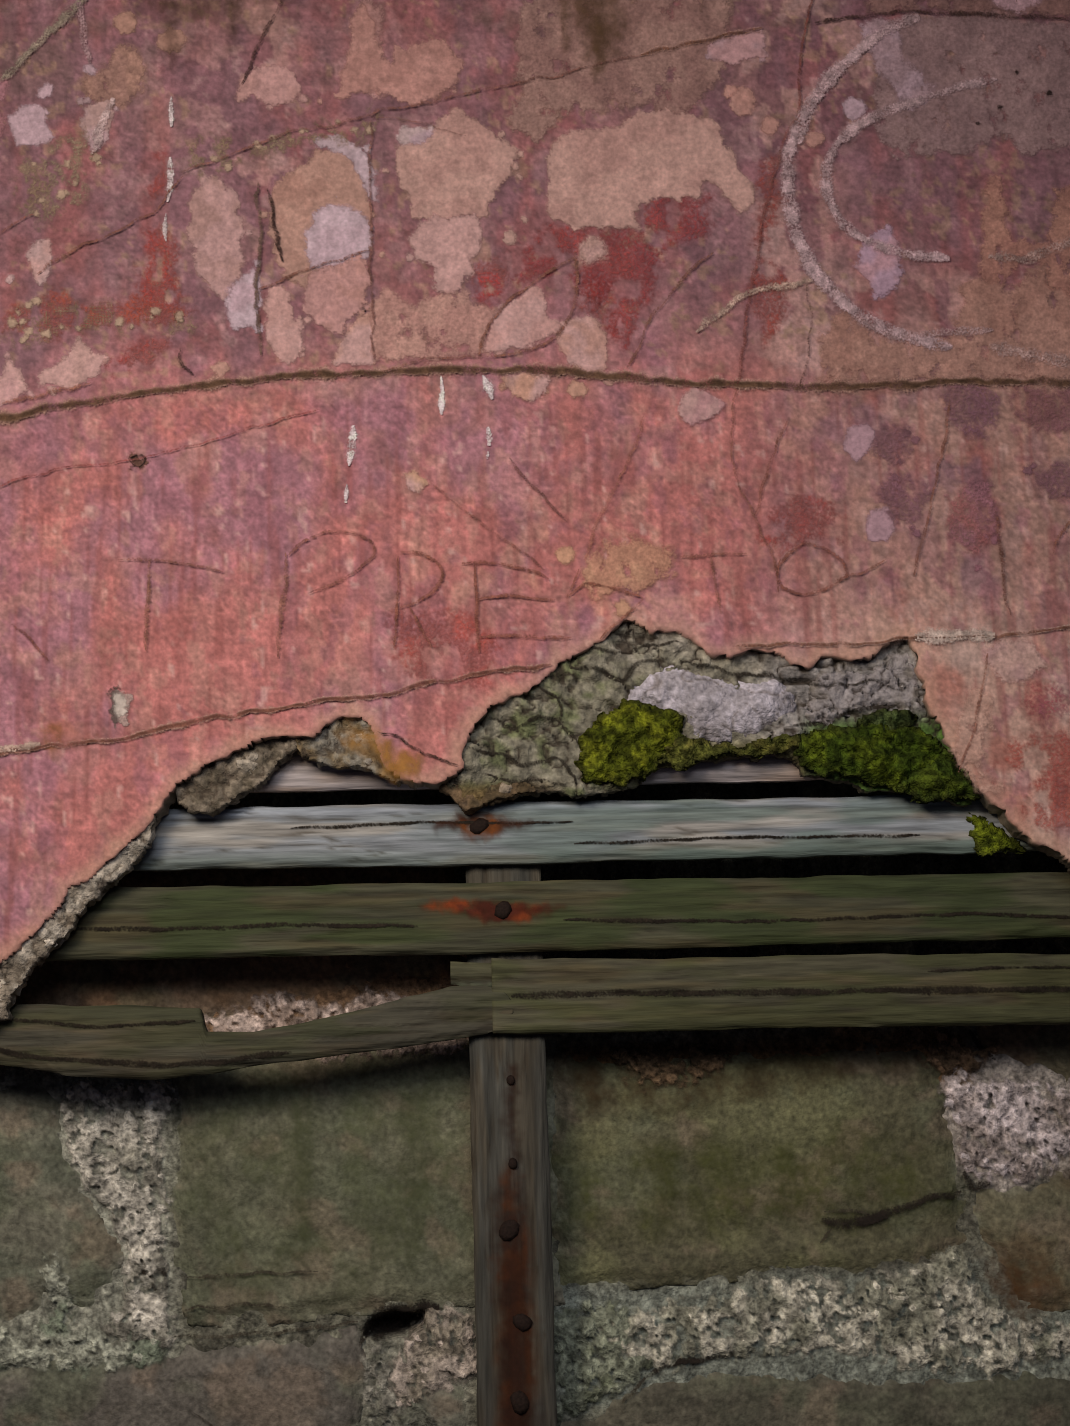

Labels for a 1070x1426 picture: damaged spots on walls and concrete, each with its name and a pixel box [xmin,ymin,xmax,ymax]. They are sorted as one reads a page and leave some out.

crack [0,0,1070,577]
crack [0,663,551,765]
flaking render [174,717,402,817]
rust [435,814,522,836]
flaking render [439,536,1003,815]
flaking render [0,814,159,1022]
rust [428,899,544,920]
spalling [204,986,406,1032]
spalling [941,1067,1070,1184]
spalling [0,1080,177,1378]
crack [820,1171,990,1243]
spalling [554,1246,1070,1422]